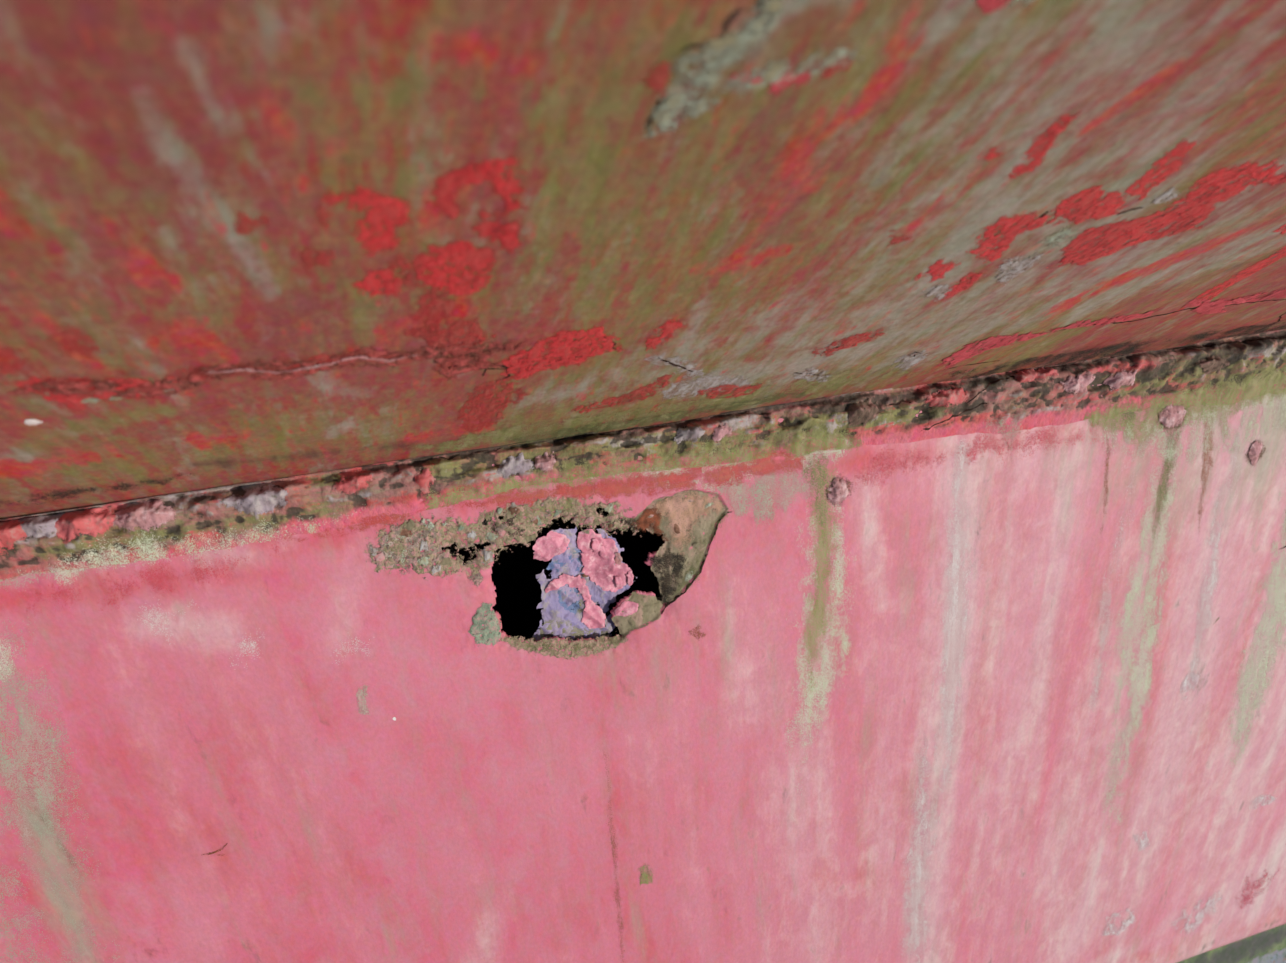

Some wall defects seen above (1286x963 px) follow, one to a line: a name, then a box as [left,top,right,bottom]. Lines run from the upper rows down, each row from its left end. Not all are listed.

peeling [638,0,875,103]
peeling [975,108,1082,180]
peeling [914,138,1286,302]
peeling [299,154,623,434]
crack [0,319,528,412]
spalling [570,318,764,413]
peeling [791,328,885,383]
peeling [893,343,1000,372]
peeling [853,421,1105,488]
spalling [431,442,845,640]
damp [1084,361,1286,693]
damp [900,416,1023,963]